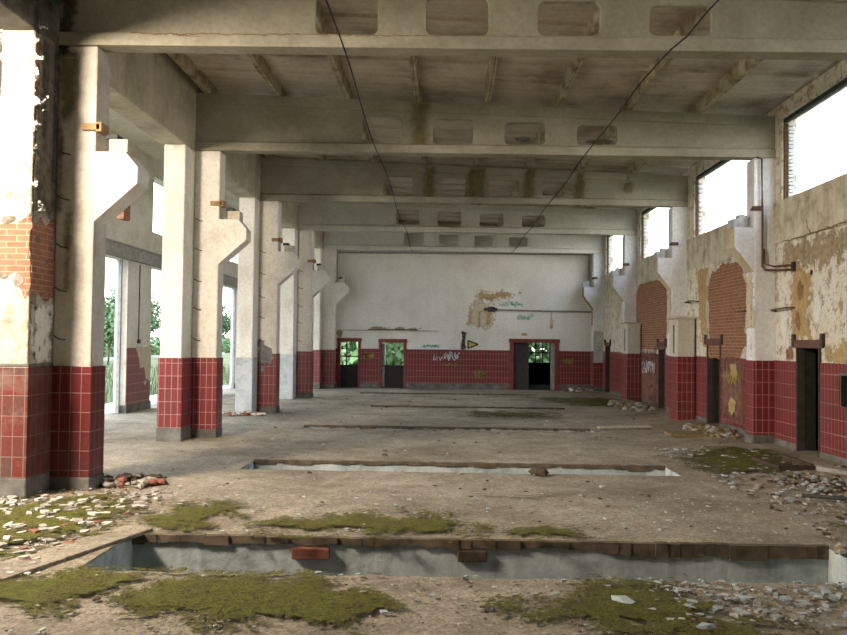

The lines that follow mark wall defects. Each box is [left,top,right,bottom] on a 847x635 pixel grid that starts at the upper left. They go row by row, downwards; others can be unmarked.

leakage [24,0,78,224]
peeling [0,25,55,363]
peeling [780,226,847,274]
peeling [136,347,151,385]
peeling [466,289,522,330]
peeling [780,298,800,359]
peeling [813,294,821,329]
flaking render [825,338,847,364]